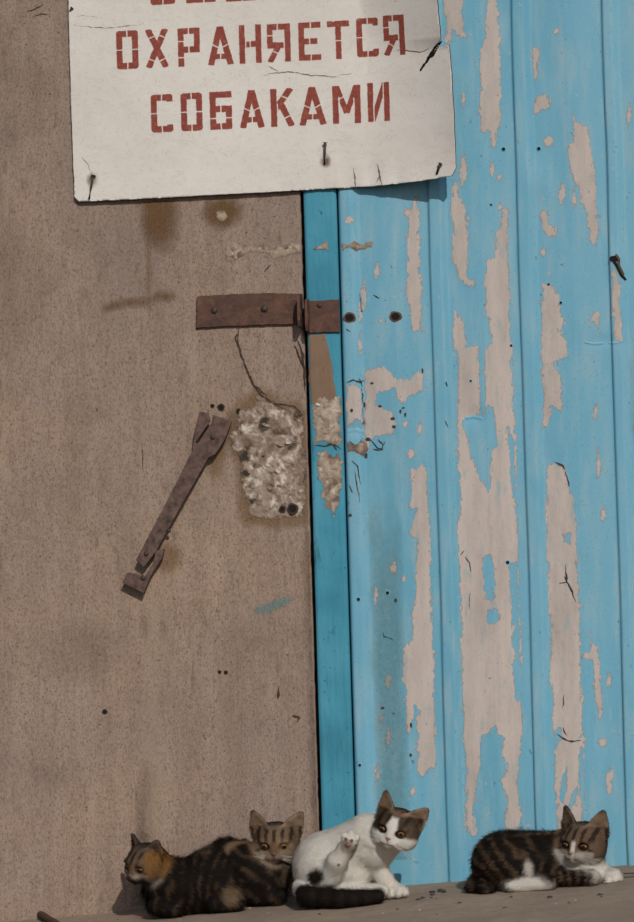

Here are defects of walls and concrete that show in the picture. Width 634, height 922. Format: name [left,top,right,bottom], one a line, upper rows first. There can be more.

peeling [442,0,468,44]
peeling [478,0,502,148]
peeling [225,241,302,261]
peeling [341,241,372,251]
peeling [558,111,599,246]
crack [235,328,306,414]
spalling [230,334,424,520]
peeling [450,154,524,836]
peeling [538,283,568,427]
peeling [385,449,437,776]
peeling [545,463,611,829]
peeling [605,767,614,794]